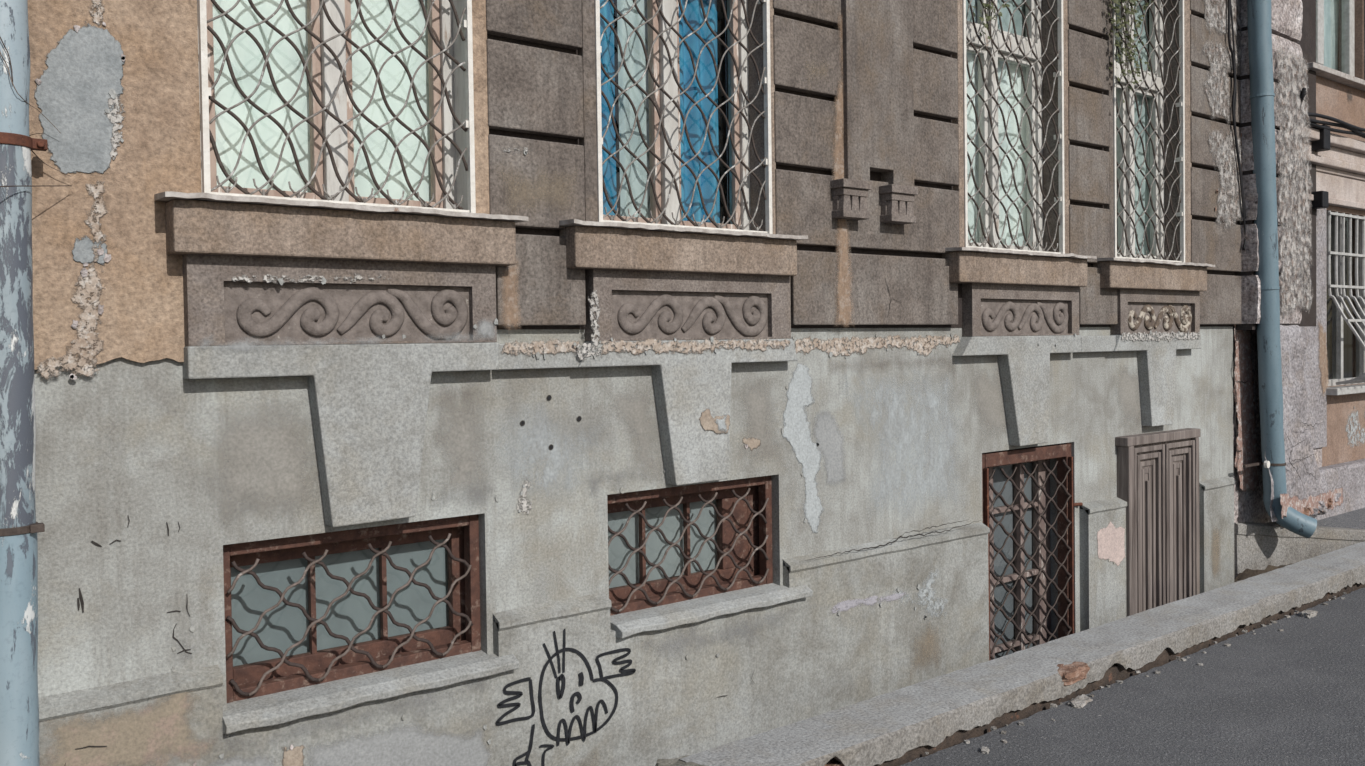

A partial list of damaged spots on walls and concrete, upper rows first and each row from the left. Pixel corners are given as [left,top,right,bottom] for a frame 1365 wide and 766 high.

peeling [104,89,125,160]
spalling [1204,0,1243,229]
peeling [36,180,111,380]
peeling [473,290,960,533]
flaking render [1233,324,1259,492]
spalling [1280,488,1343,519]